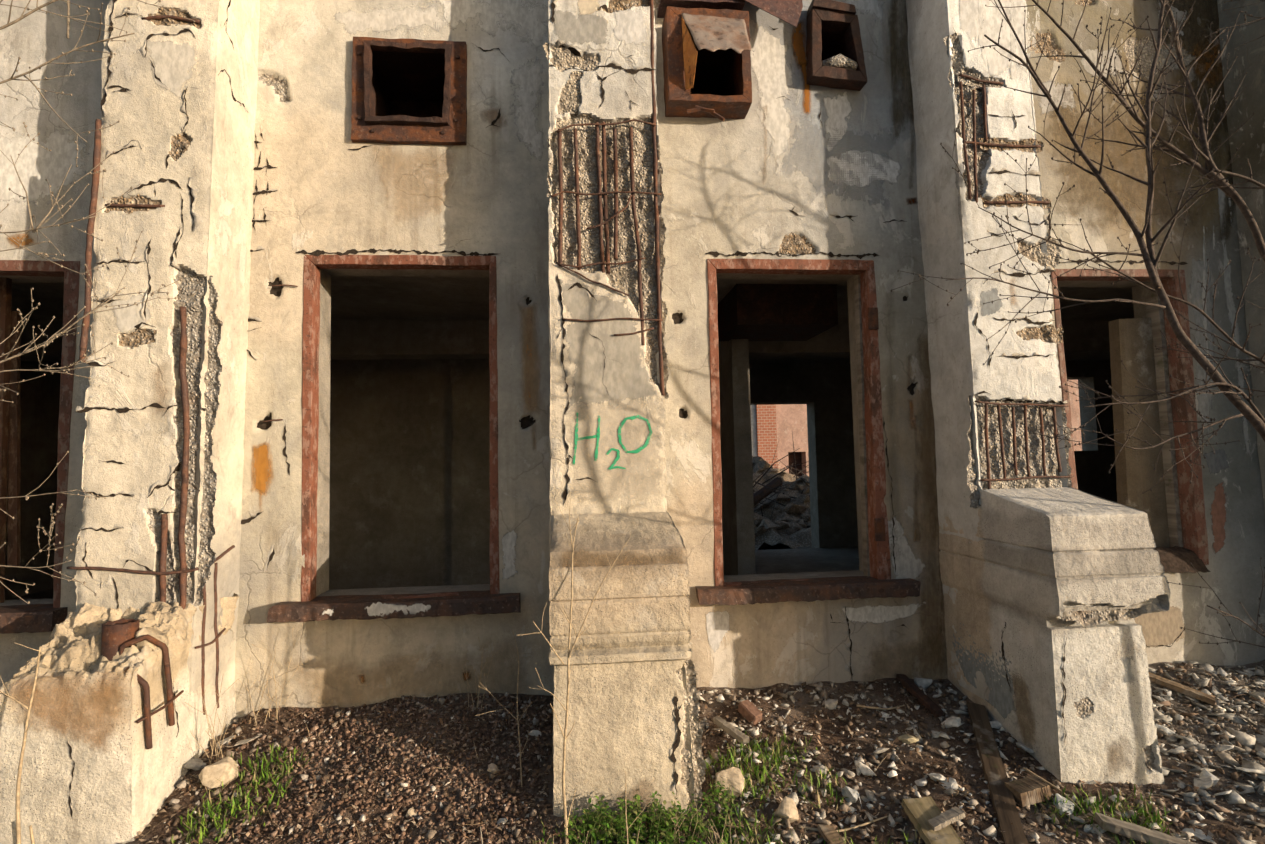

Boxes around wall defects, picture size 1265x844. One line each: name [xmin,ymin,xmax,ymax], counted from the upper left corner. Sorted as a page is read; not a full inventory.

rust [792,22,810,113]
peeling [943,0,1196,209]
crack [94,0,278,330]
crack [295,248,498,256]
spalling [334,0,669,406]
crack [86,356,116,366]
spalling [112,267,223,610]
crack [556,274,622,507]
spalling [967,395,1074,508]
peeling [1058,606,1185,648]
crack [669,691,682,797]
crack [1060,638,1068,743]